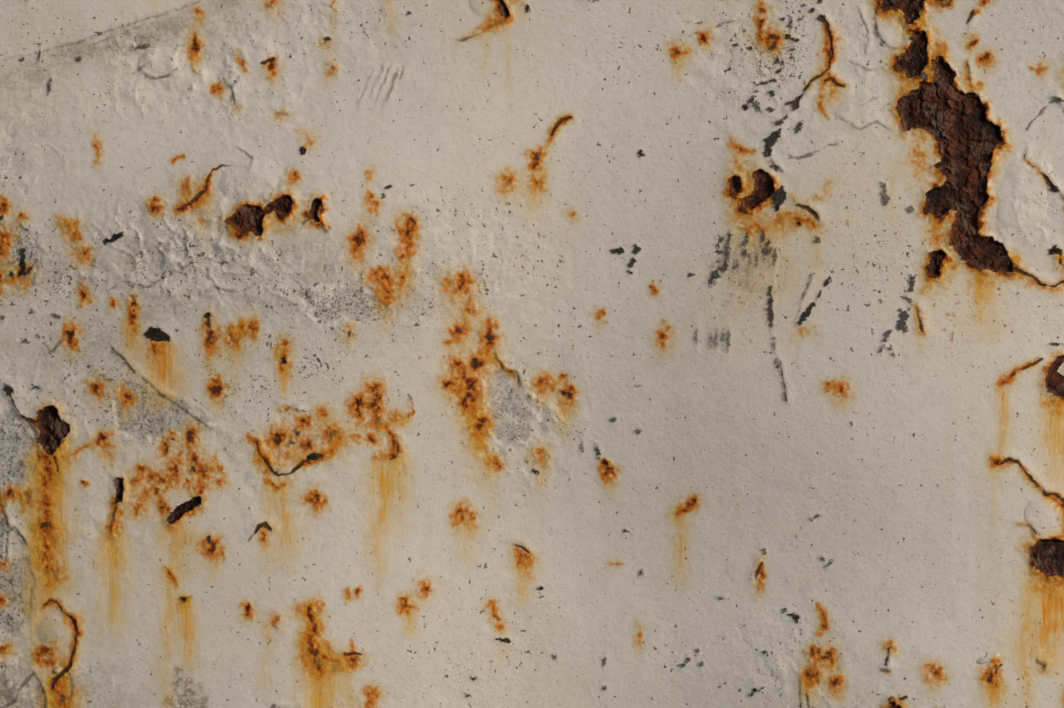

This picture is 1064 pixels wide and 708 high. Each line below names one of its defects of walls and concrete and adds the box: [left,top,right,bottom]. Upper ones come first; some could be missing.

rust [461,0,518,41]
rust [225,170,330,242]
rust [525,114,574,195]
rust [724,138,831,243]
rust [872,0,1064,335]
rust [0,384,117,593]
rust [105,424,227,564]
rust [246,378,415,546]
rust [438,270,579,476]
rust [988,441,1064,672]
rust [996,351,1064,453]
rust [295,599,362,708]